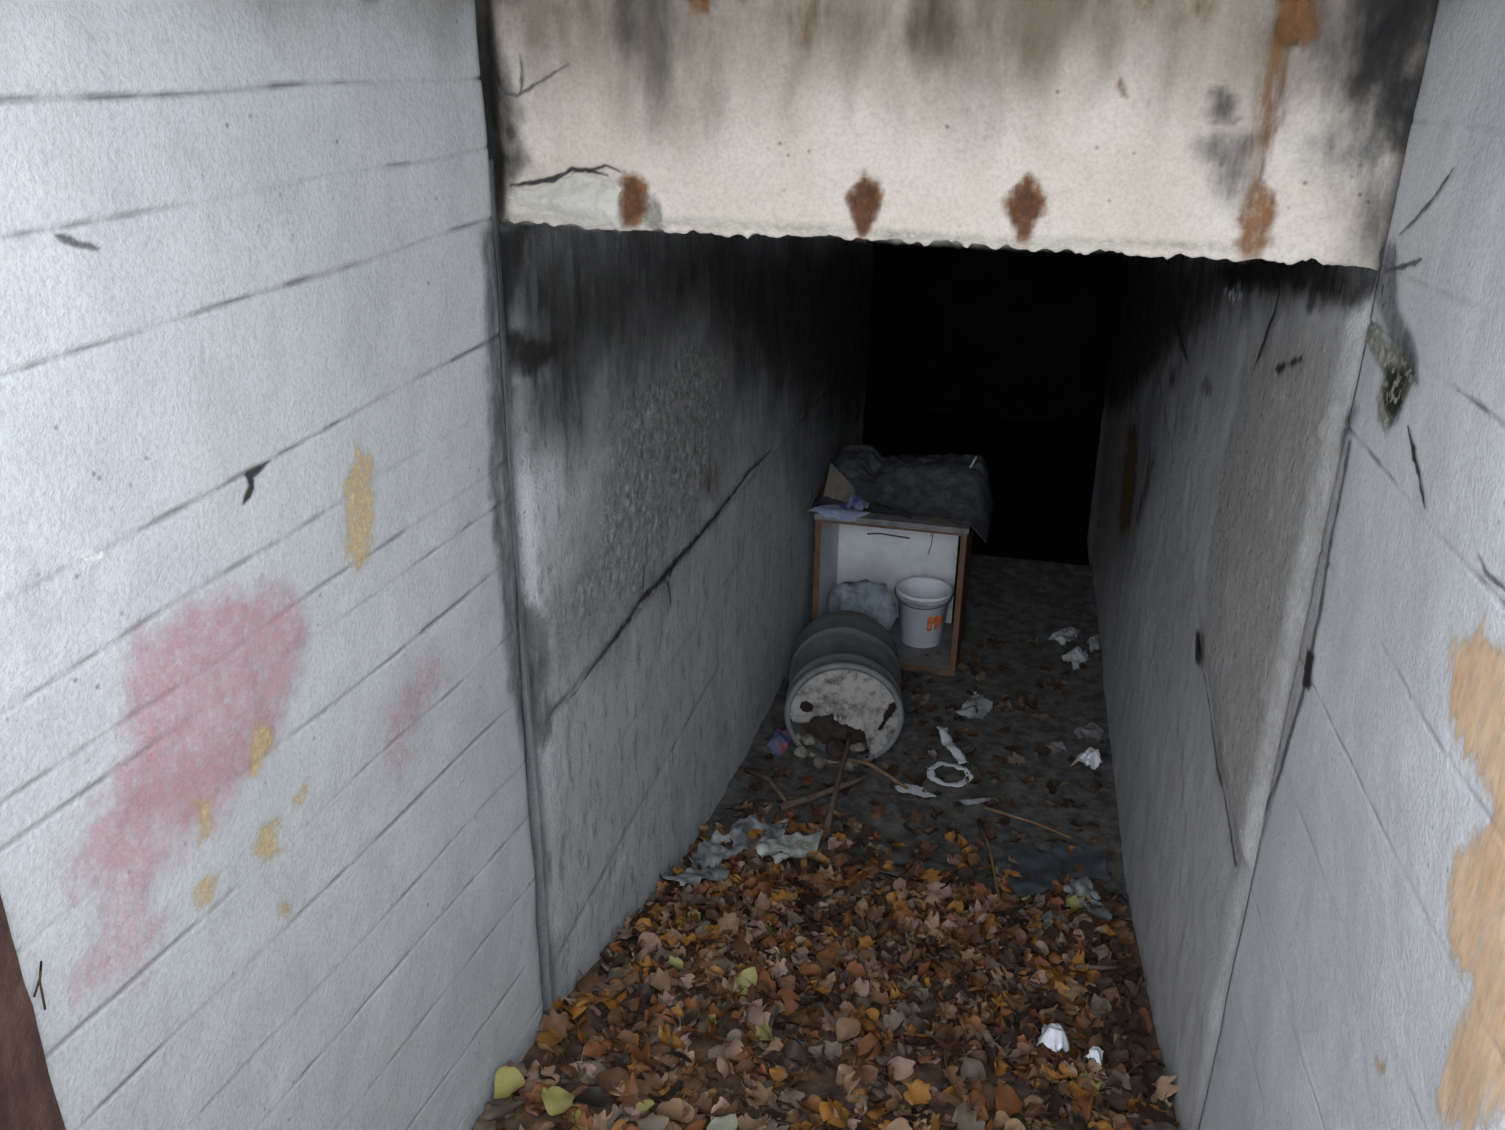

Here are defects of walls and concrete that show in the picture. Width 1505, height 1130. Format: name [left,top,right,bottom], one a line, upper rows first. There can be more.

leakage [525,0,711,81]
leakage [786,0,887,52]
leakage [917,0,1042,71]
leakage [1248,0,1332,70]
rust [1239,0,1315,257]
crack [511,164,619,186]
rust [619,175,647,226]
rust [847,177,881,236]
rust [1005,176,1045,242]
crack [566,450,771,702]
peeling [1437,619,1505,1130]